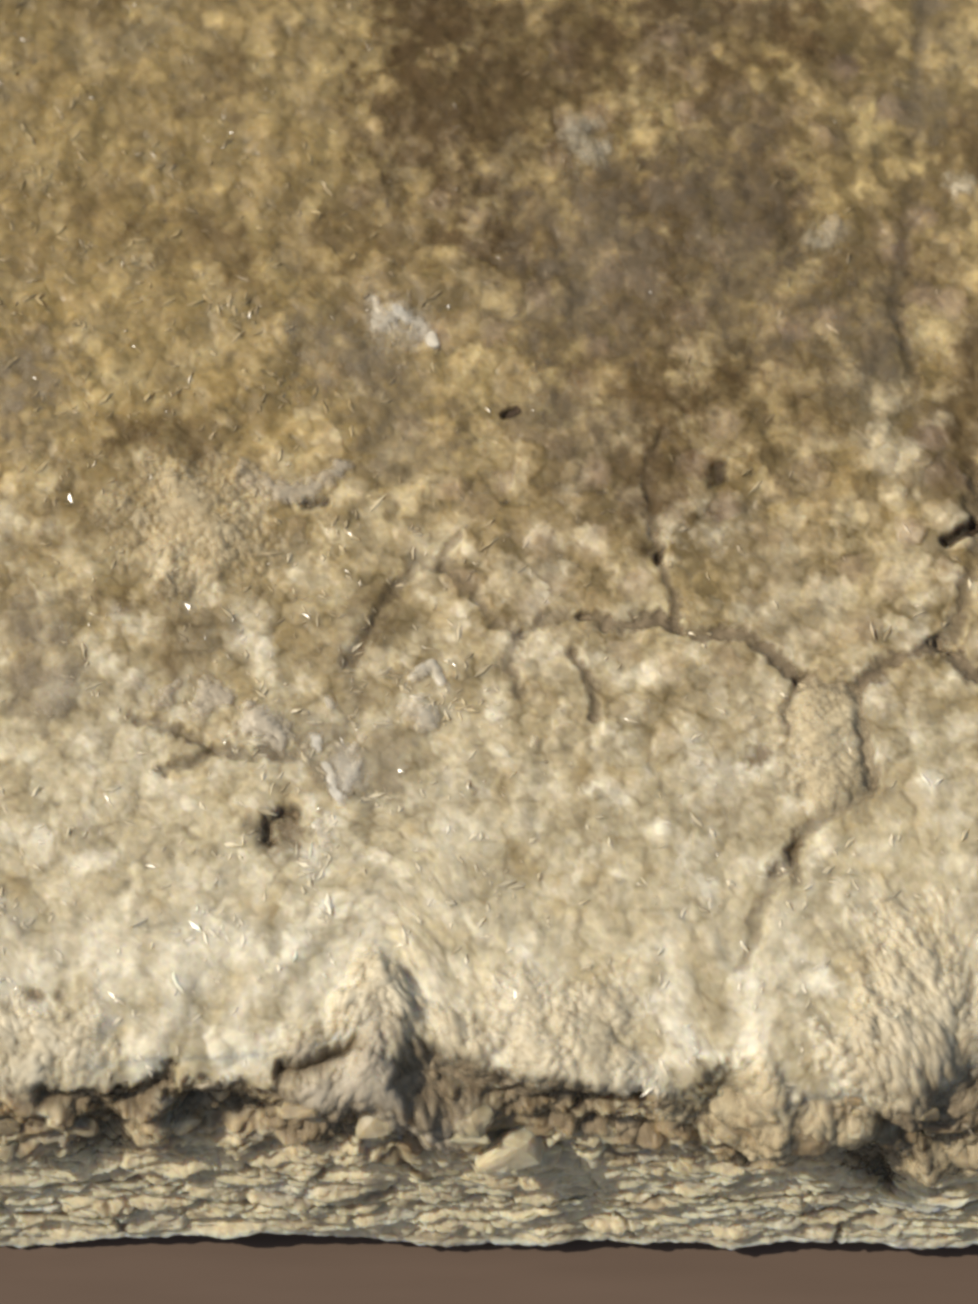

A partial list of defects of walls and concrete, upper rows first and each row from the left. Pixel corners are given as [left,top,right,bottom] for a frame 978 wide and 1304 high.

water stain [431,226,524,258]
crack [570,650,599,722]
crack [578,459,978,792]
spalling [0,1016,978,1251]